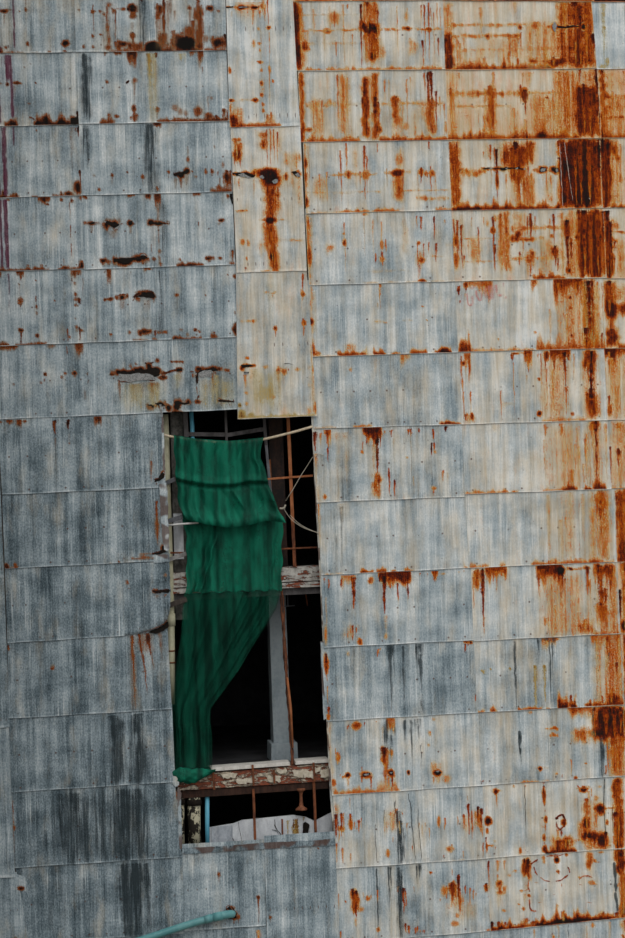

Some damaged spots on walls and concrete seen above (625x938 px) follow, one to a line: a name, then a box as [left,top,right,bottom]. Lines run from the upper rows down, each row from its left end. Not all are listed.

corrosion [82,0,226,90]
corrosion [29,111,79,137]
corrosion [150,0,283,279]
corrosion [32,170,87,207]
corrosion [127,187,162,271]
corrosion [238,363,316,418]
corrosion [291,0,625,938]